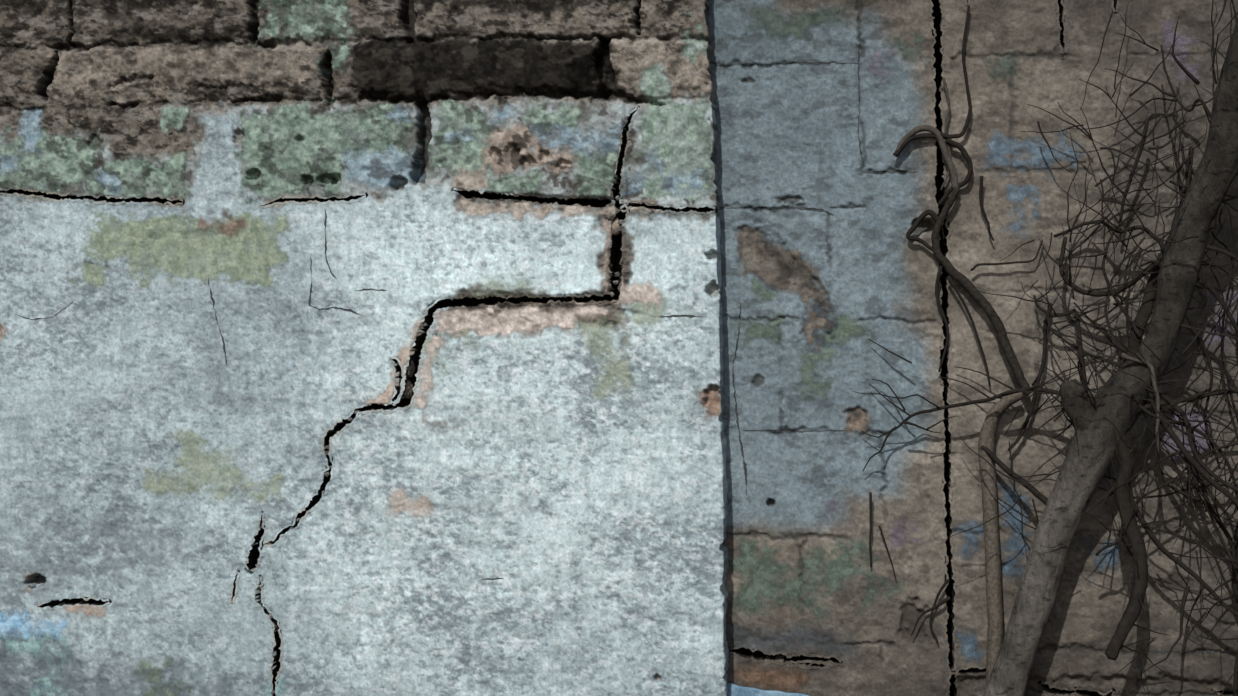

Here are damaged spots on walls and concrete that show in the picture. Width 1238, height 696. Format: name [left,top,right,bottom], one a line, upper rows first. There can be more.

crack [0,186,185,207]
spalling [452,123,661,253]
spalling [367,269,661,408]
crack [229,105,860,696]
spalling [736,225,833,350]
crack [718,0,986,696]
crack [38,595,111,611]